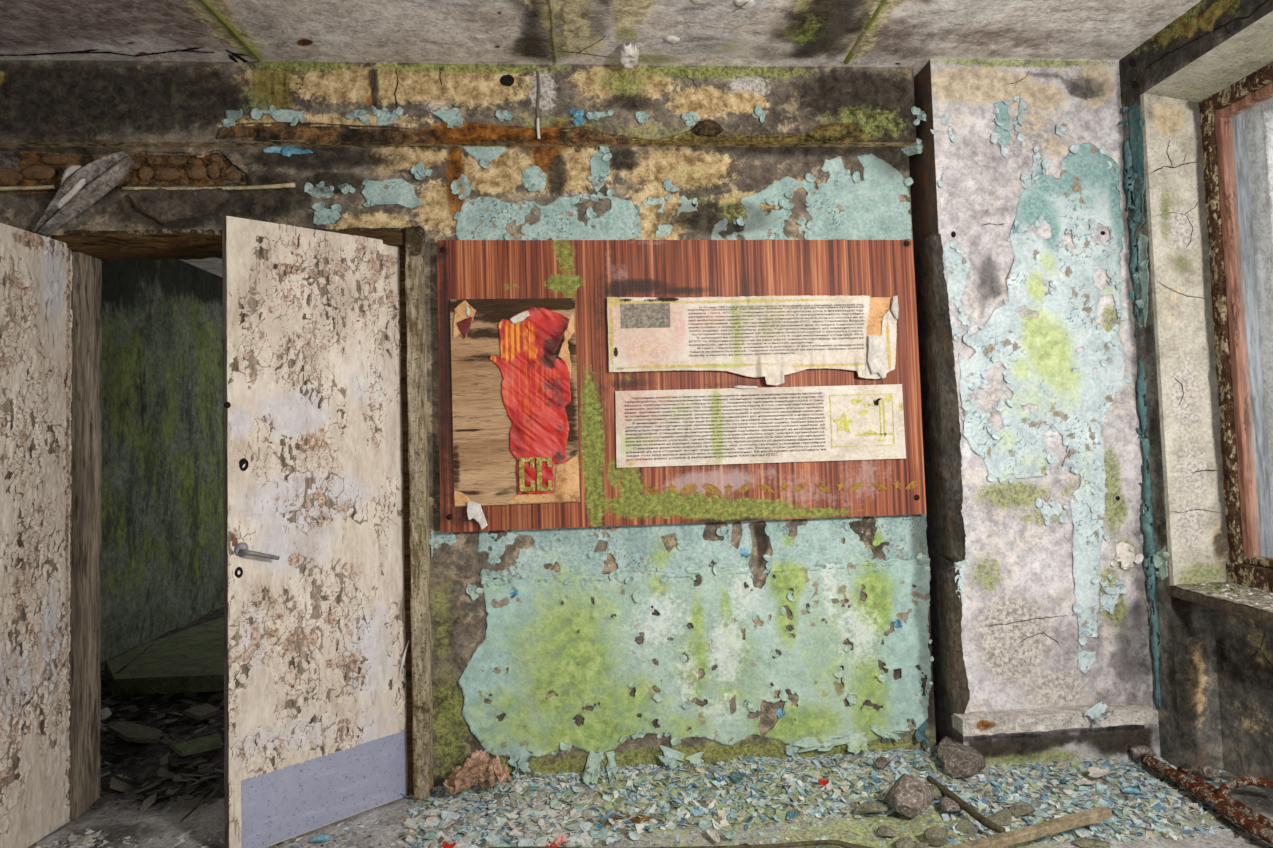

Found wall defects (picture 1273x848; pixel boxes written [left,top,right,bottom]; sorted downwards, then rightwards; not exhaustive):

water stain [517,0,546,57]
water stain [789,0,864,57]
spalling [500,74,514,86]
spalling [0,105,874,240]
peeling [428,95,1169,848]